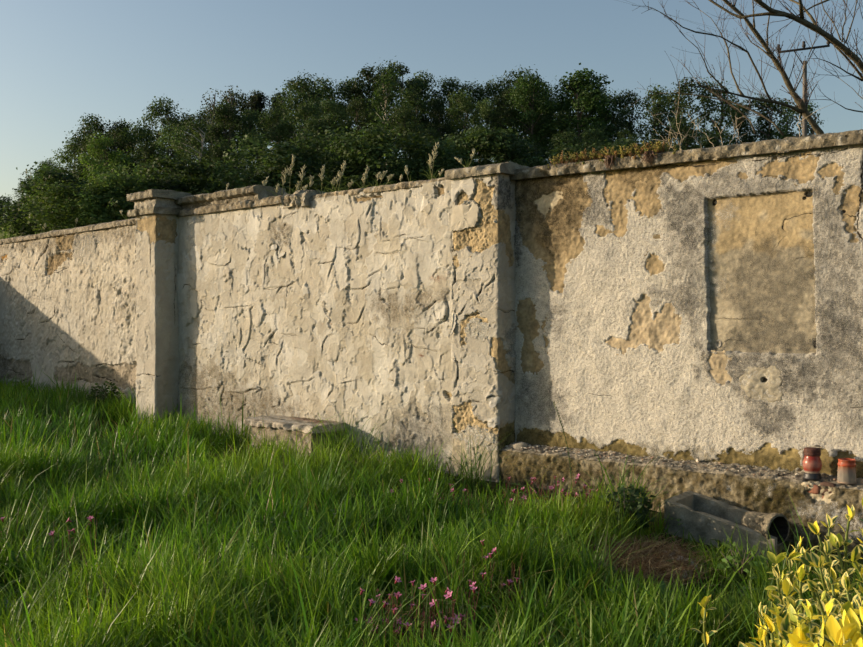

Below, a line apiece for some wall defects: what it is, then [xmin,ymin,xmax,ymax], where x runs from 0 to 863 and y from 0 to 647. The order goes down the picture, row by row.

crack [320,203,424,325]
peeling [437,173,593,293]
water stain [624,165,736,327]
crack [649,161,721,169]
peeling [595,152,863,243]
crack [743,147,863,240]
crack [61,339,158,381]
crack [374,274,514,380]
peeling [460,298,551,384]
spalling [602,294,681,355]
water stain [693,188,863,434]
peeling [712,443,808,472]